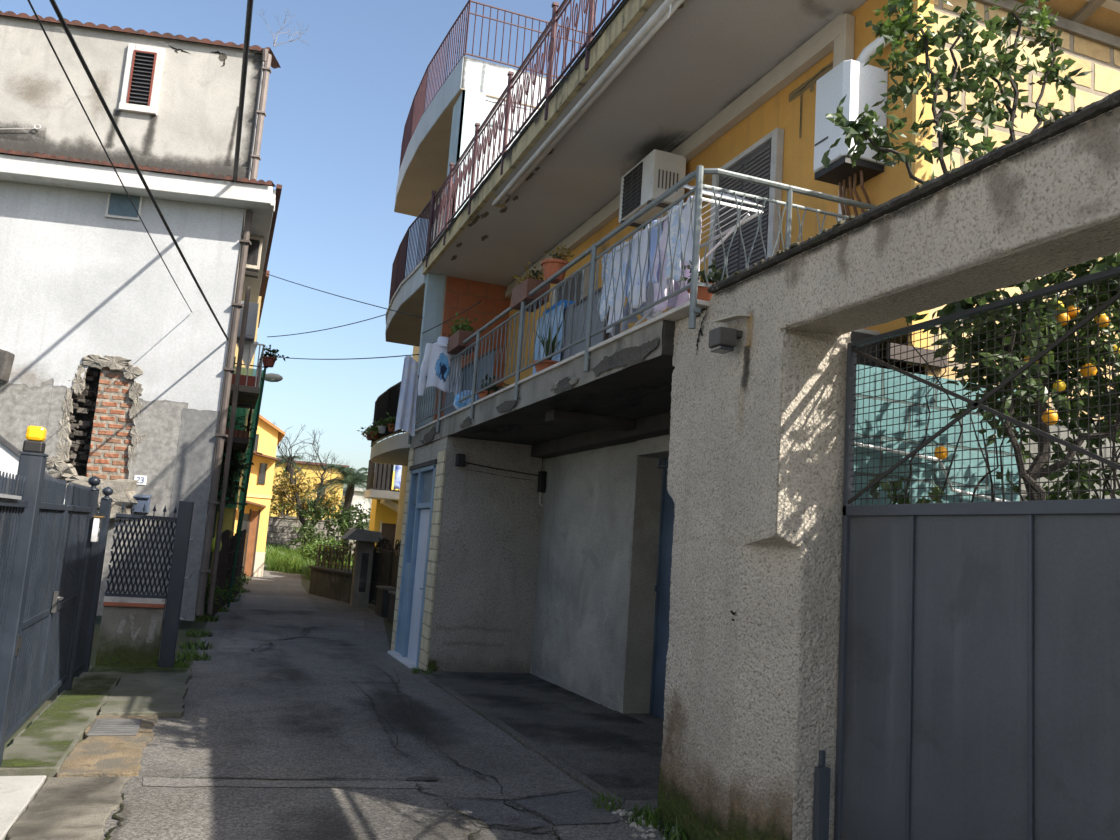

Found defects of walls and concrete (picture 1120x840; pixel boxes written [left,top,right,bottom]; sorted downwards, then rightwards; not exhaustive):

leakage [0,52,262,179]
spalling [591,338,658,377]
peeling [0,354,188,616]
leakage [659,755,793,840]